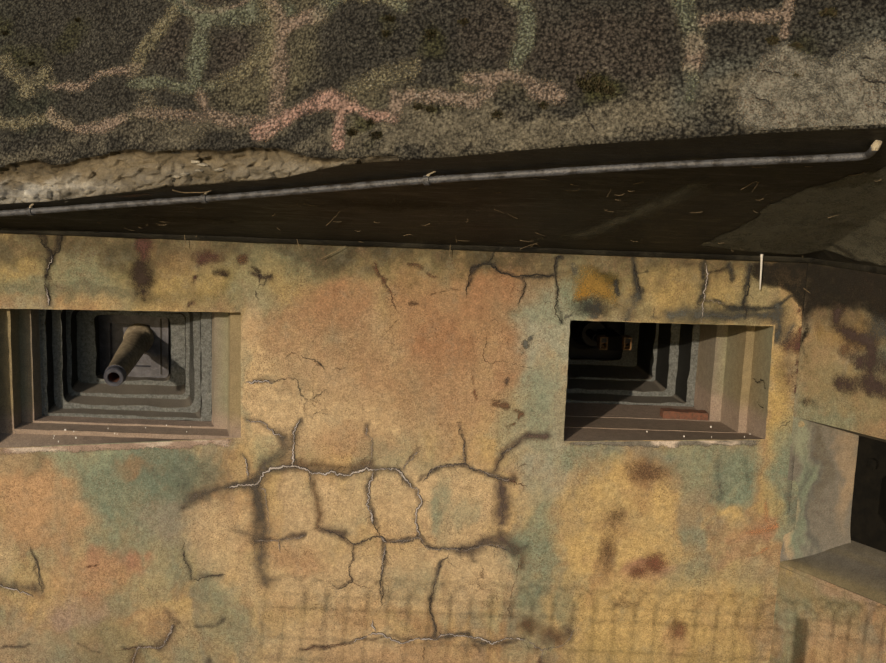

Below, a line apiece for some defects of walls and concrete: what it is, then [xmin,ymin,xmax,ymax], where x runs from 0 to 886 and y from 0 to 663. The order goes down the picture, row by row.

spalling [0,0,568,204]
peeling [701,166,886,266]
crack [38,235,62,305]
crack [457,252,564,323]
water stain [666,302,794,344]
water stain [752,262,886,398]
crack [225,352,550,660]
crack [0,547,42,598]
crack [182,543,225,581]